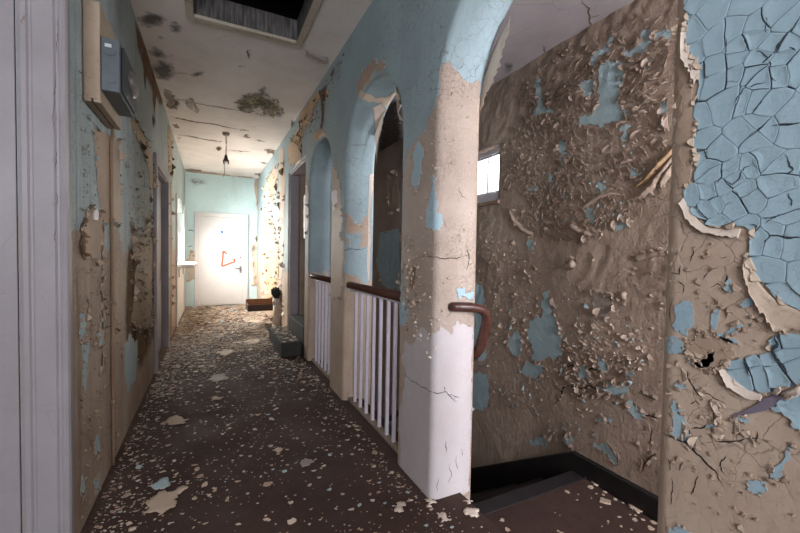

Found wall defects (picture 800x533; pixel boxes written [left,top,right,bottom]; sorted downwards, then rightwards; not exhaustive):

damp [141,14,162,25]
peeling [357,58,403,159]
crack [725,18,799,137]
peeling [79,114,158,520]
peeling [163,52,345,335]
crack [418,243,470,270]
peeling [398,0,800,522]
crack [669,247,694,326]
crack [696,150,794,214]
crack [750,193,799,242]
crack [771,335,787,375]
crack [633,352,760,503]